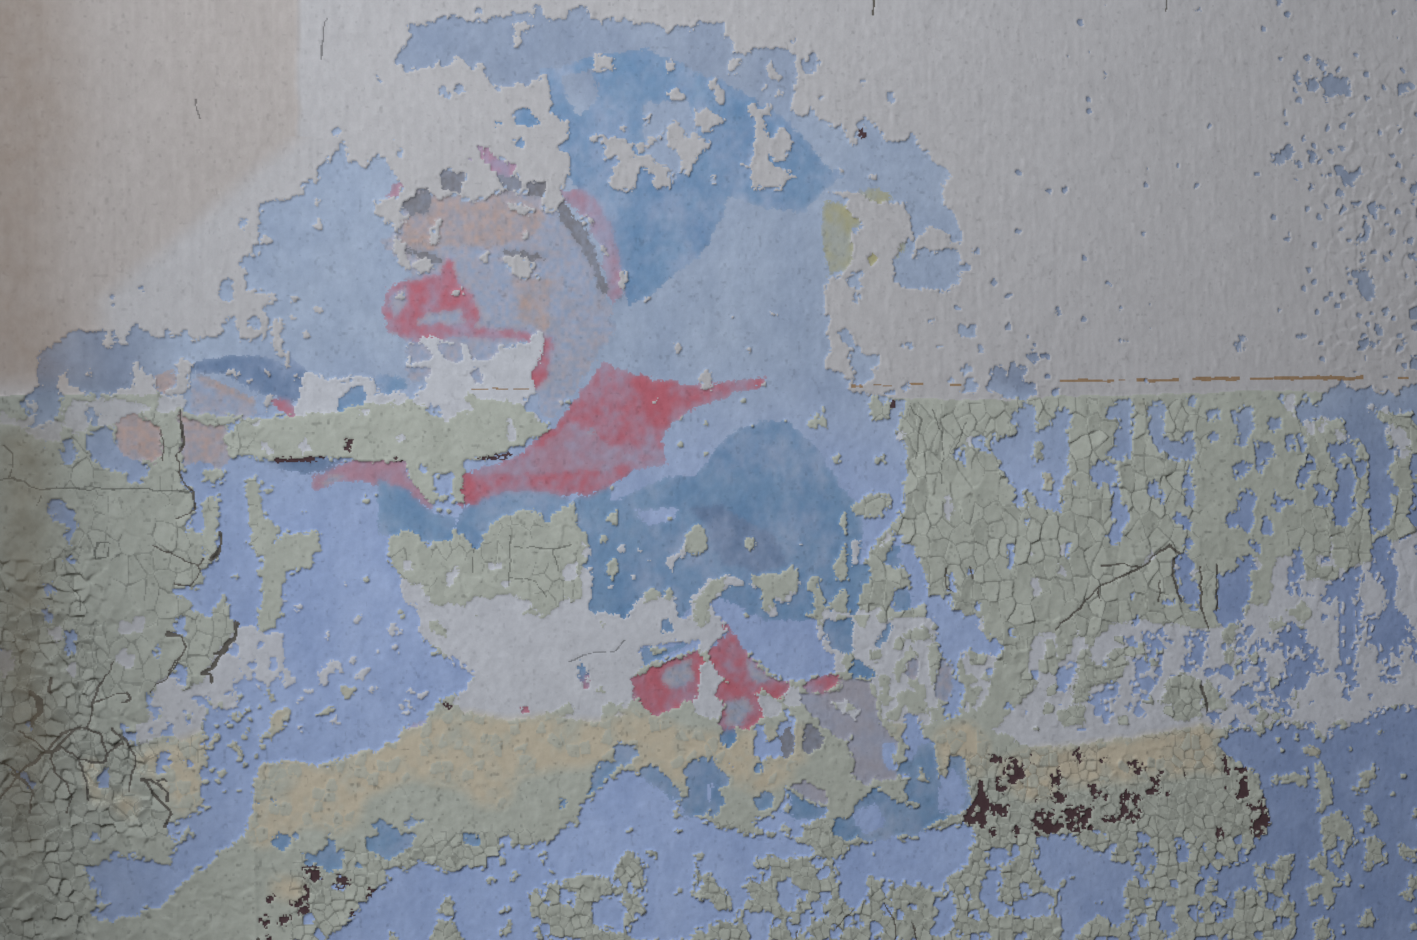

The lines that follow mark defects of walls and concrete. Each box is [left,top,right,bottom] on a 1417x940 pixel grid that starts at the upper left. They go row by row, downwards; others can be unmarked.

crack [0,409,258,940]
peeling [0,4,1016,923]
peeling [303,135,1417,940]
peeling [1284,53,1415,125]